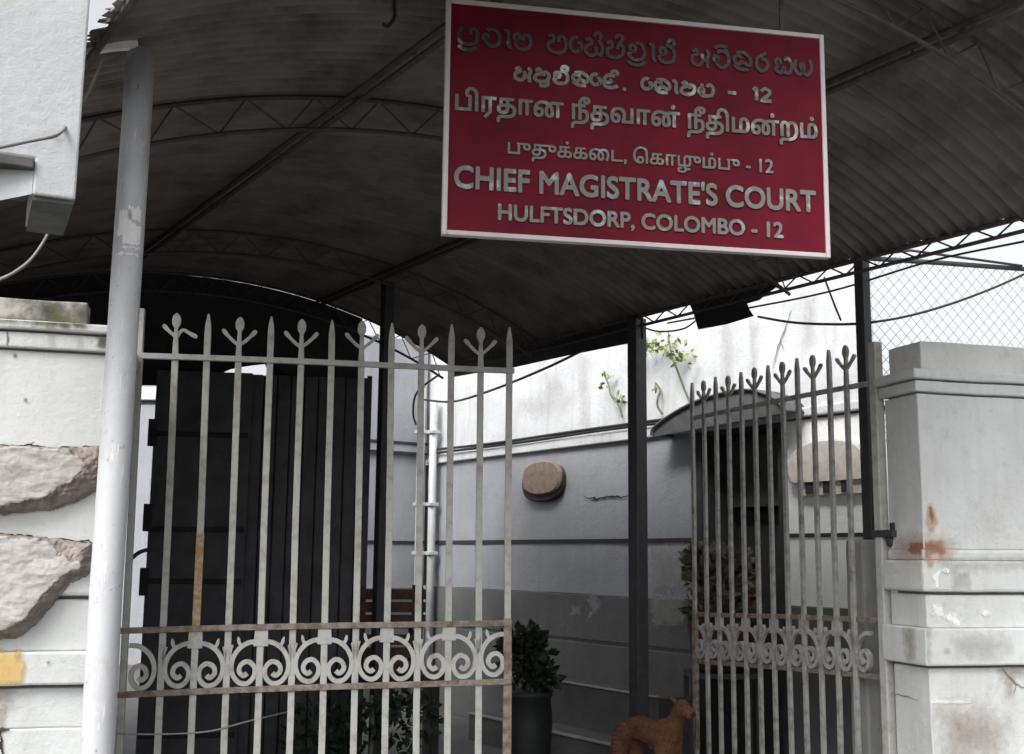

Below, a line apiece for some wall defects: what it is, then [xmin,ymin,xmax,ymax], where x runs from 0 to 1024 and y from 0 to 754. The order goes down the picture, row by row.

crack [584,494,627,502]
rust [908,543,943,561]
peeling [933,605,960,626]